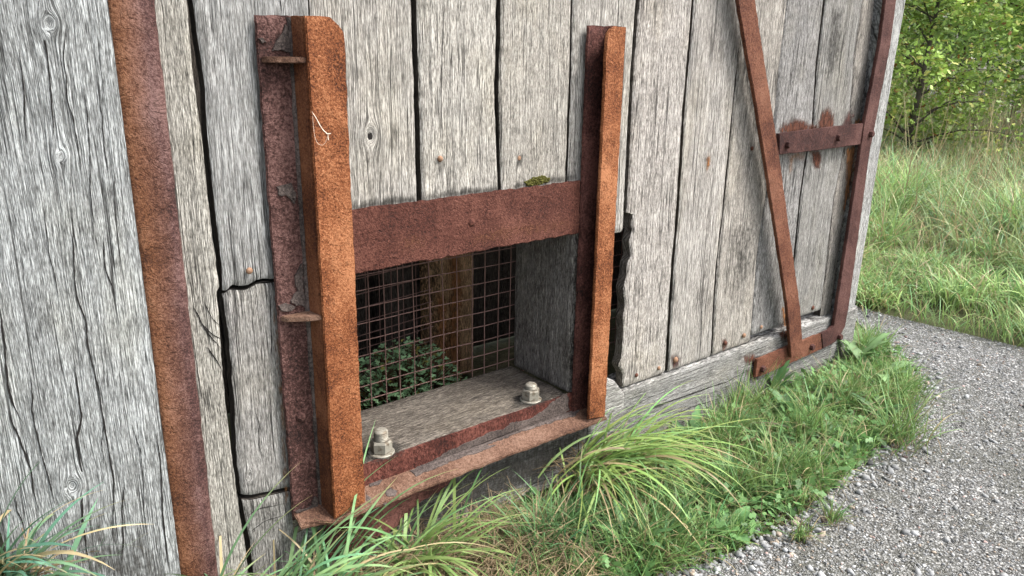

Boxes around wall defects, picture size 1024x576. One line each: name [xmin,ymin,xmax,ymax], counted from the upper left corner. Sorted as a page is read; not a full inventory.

corrosion [780,108,862,132]
corrosion [843,146,856,210]
crack [0,37,171,576]
crack [191,281,272,421]
corrosion [410,393,580,477]